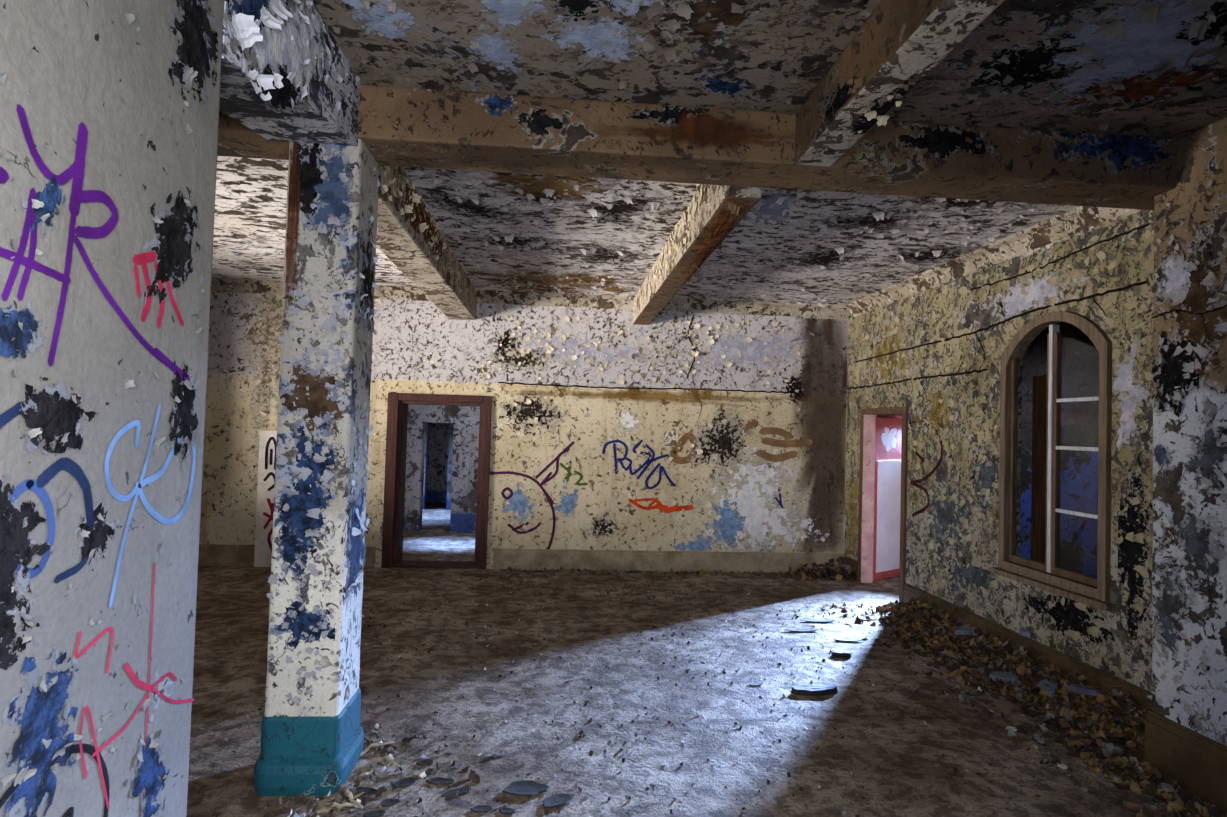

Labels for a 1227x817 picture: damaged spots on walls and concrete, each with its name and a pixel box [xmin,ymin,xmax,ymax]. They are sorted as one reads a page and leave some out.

peeling [167,0,871,146]
peeling [140,186,205,306]
peeling [153,356,201,477]
peeling [240,142,1072,710]
peeling [861,203,1227,704]
peeling [0,474,176,817]